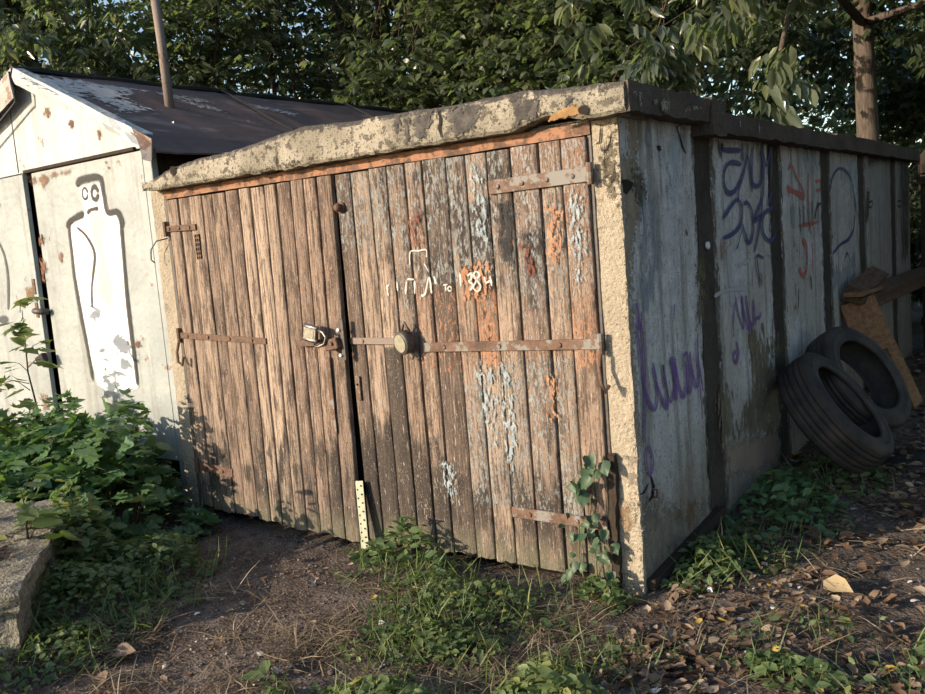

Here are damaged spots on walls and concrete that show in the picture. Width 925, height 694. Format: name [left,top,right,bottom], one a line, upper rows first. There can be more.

damp [393,110,433,145]
damp [445,103,482,138]
damp [511,97,540,125]
spalling [548,104,589,122]
rust [32,170,70,188]
peeling [455,158,589,308]
damp [722,430,781,476]